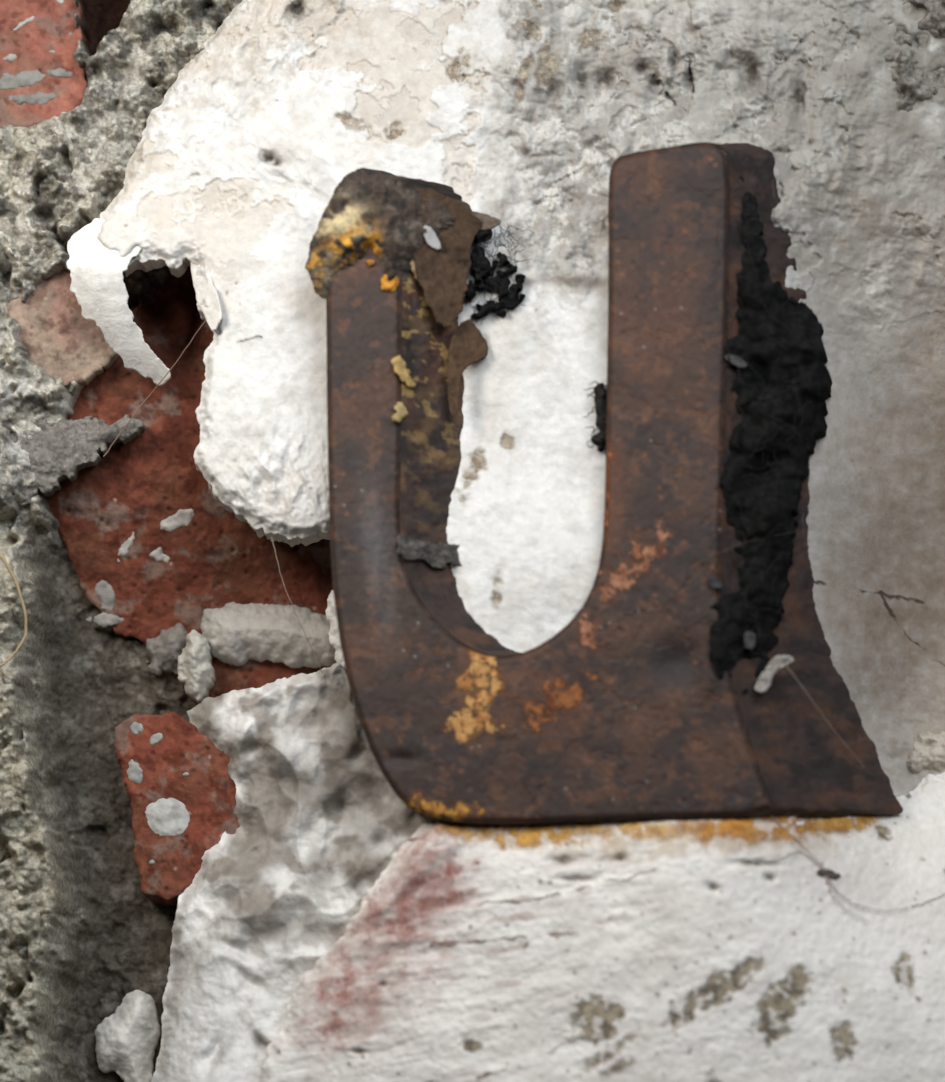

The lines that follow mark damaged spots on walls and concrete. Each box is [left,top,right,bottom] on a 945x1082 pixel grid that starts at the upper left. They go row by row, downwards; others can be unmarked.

spalling [0,0,88,128]
spalling [6,218,333,644]
corrosion [598,522,669,601]
corrosion [580,614,596,649]
spalling [209,654,328,698]
corrosion [444,651,505,742]
corrosion [526,674,598,733]
spalling [114,712,240,906]
corrosion [400,794,876,849]